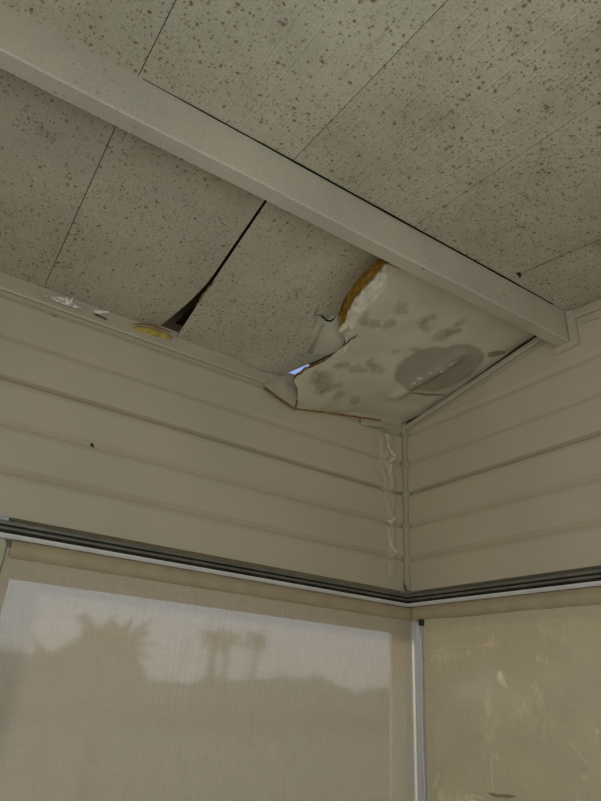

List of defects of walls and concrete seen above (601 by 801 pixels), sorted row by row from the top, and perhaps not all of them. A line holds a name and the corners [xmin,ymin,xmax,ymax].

crack [175,200,265,326]
crack [144,79,601,305]